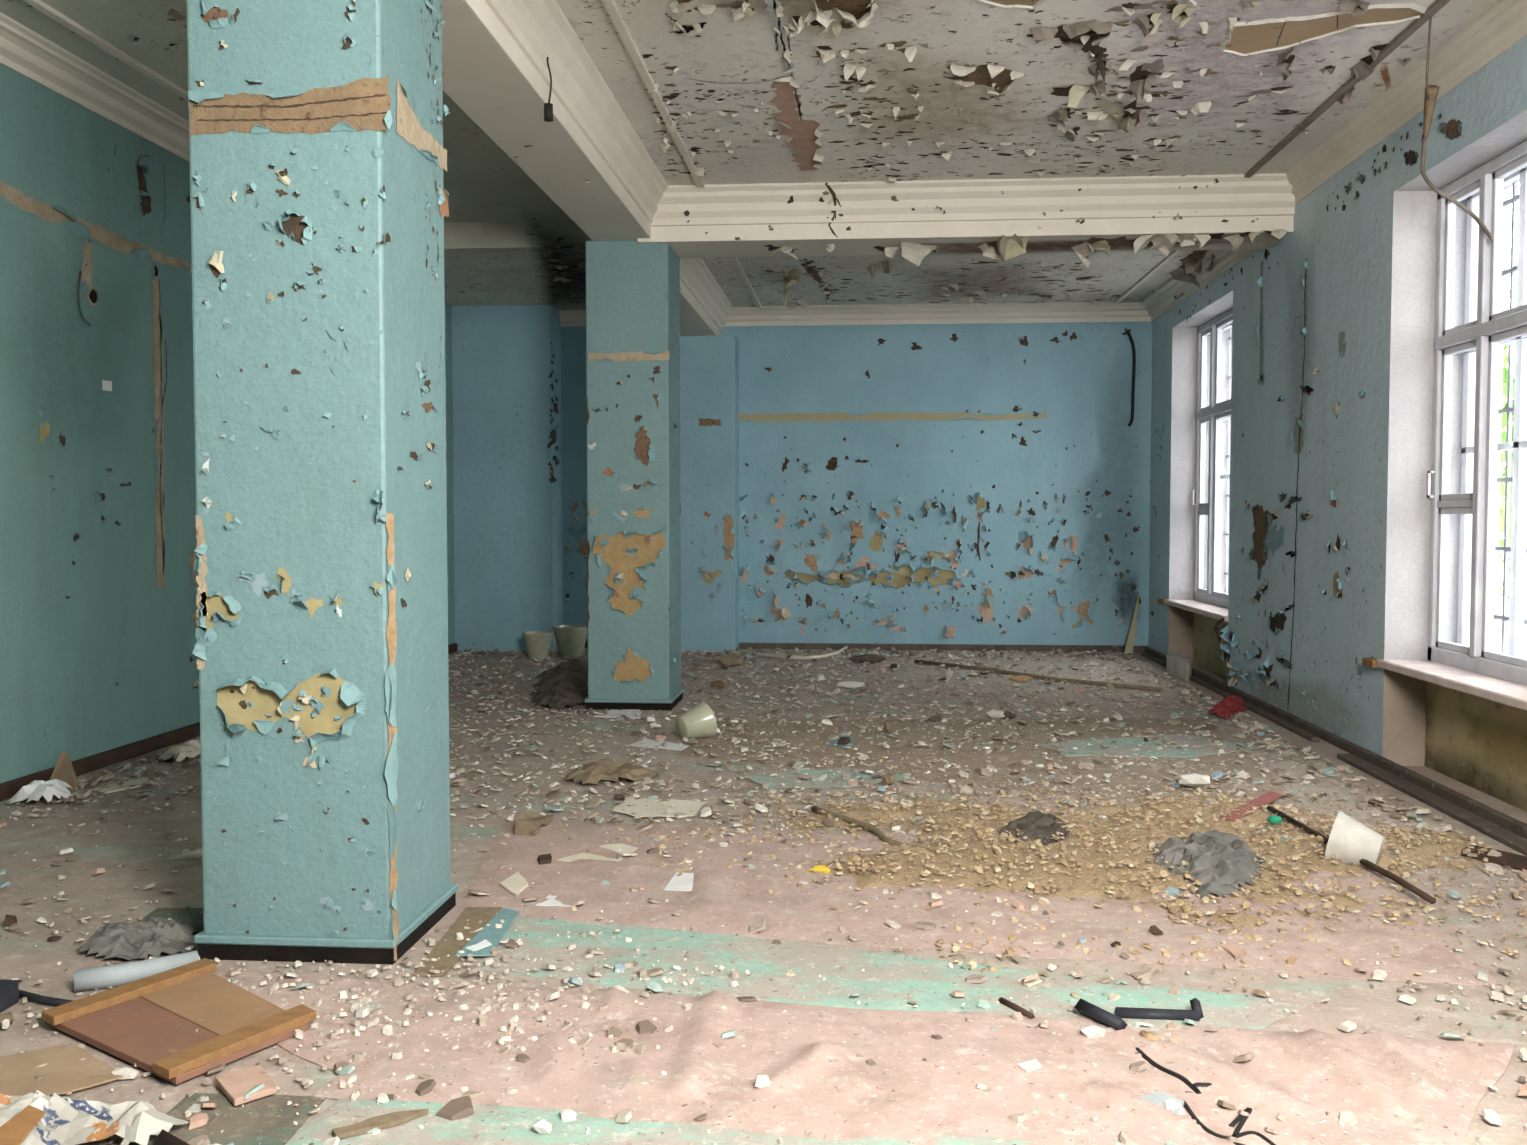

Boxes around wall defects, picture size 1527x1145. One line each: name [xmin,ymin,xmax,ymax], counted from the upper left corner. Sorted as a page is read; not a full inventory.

peeling [180,80,224,108]
peeling [668,0,755,36]
peeling [950,64,1025,100]
flaking render [979,0,1427,169]
peeling [203,251,227,309]
peeling [1133,211,1286,321]
peeling [563,335,684,615]
peeling [698,404,1159,638]
peeling [189,496,367,768]
peeling [370,489,425,961]
peeling [609,647,655,685]
peeling [1220,492,1376,722]